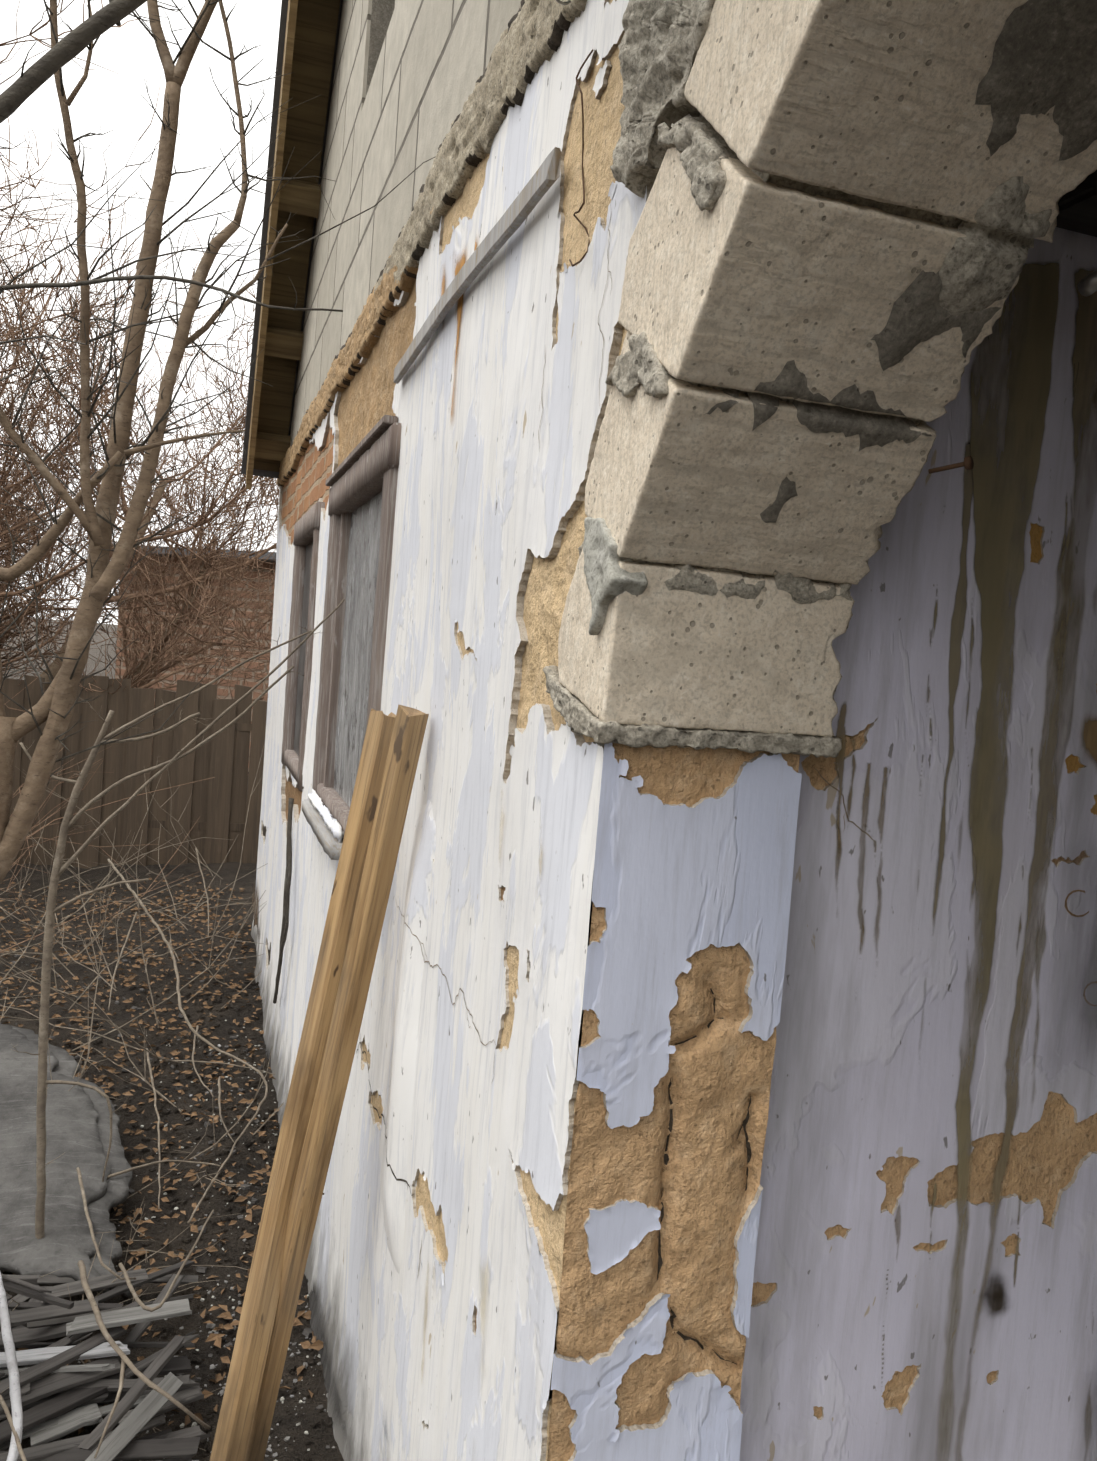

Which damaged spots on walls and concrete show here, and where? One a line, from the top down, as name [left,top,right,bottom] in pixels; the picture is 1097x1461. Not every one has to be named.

peeling [551,30,625,351]
spalling [502,322,878,808]
peeling [1029,522,1045,564]
water stain [836,704,888,950]
water stain [930,262,1097,1341]
crack [397,906,495,1083]
peeling [495,942,530,1052]
peeling [412,1168,448,1286]
spalling [508,943,777,1442]
peeling [876,1156,921,1215]
peeling [927,1091,1097,1229]
spalling [539,1389,578,1461]